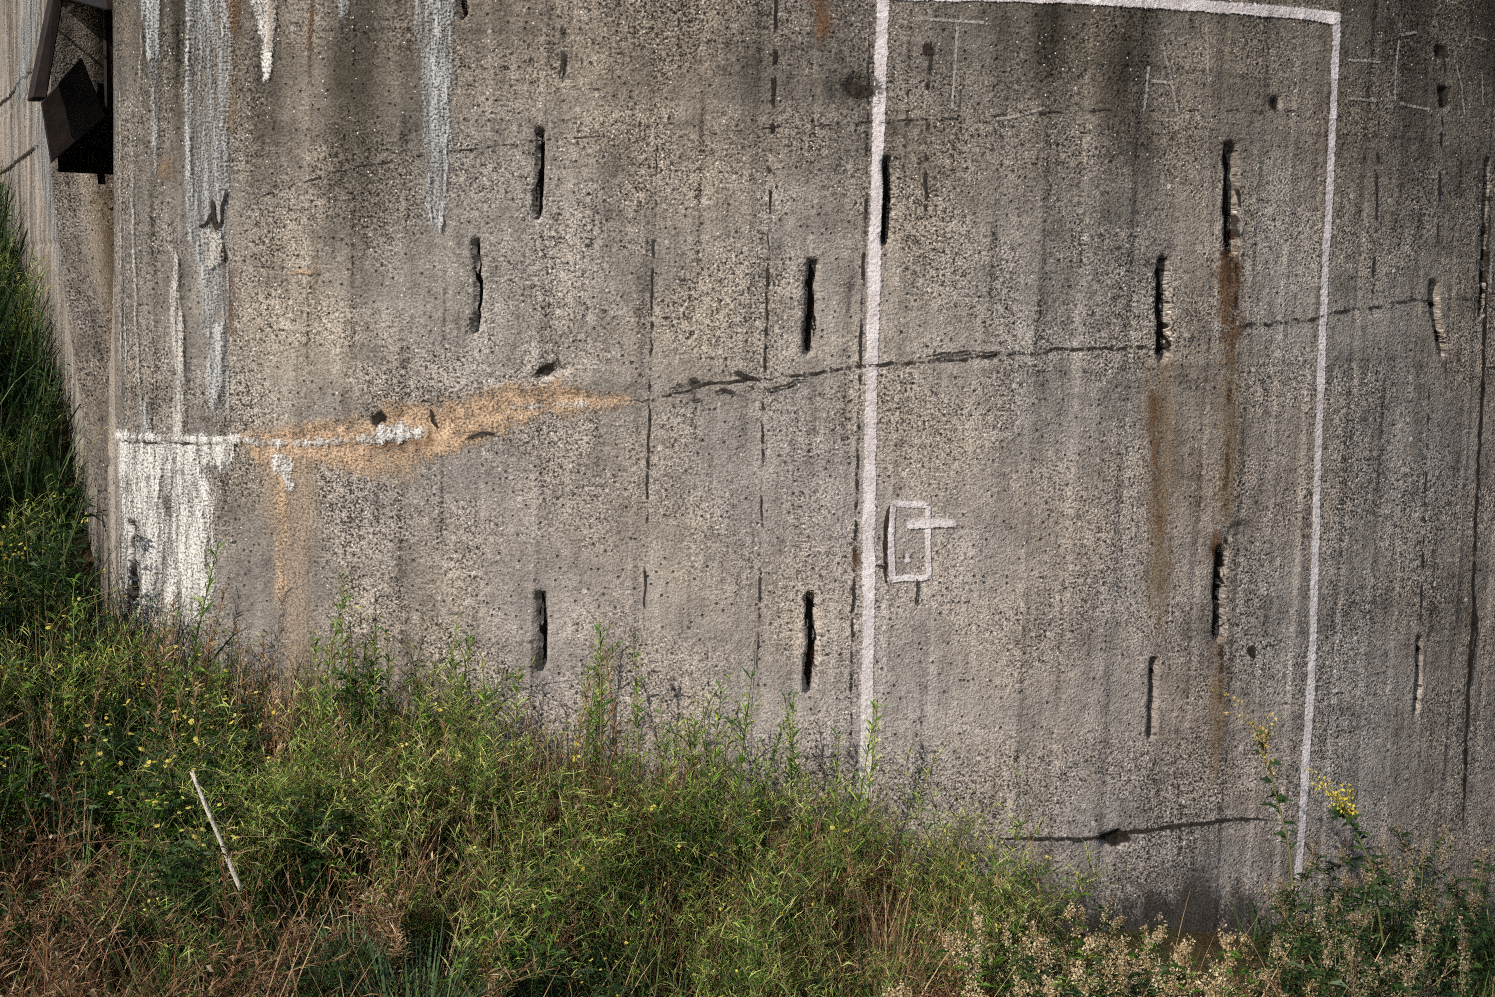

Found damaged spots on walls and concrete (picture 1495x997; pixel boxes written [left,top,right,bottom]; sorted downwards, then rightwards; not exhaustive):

efflorescence [139,0,233,413]
efflorescence [409,0,458,233]
rust [1212,196,1245,367]
water stain [119,437,209,613]
crack [634,0,1495,831]
crack [997,817,1268,843]